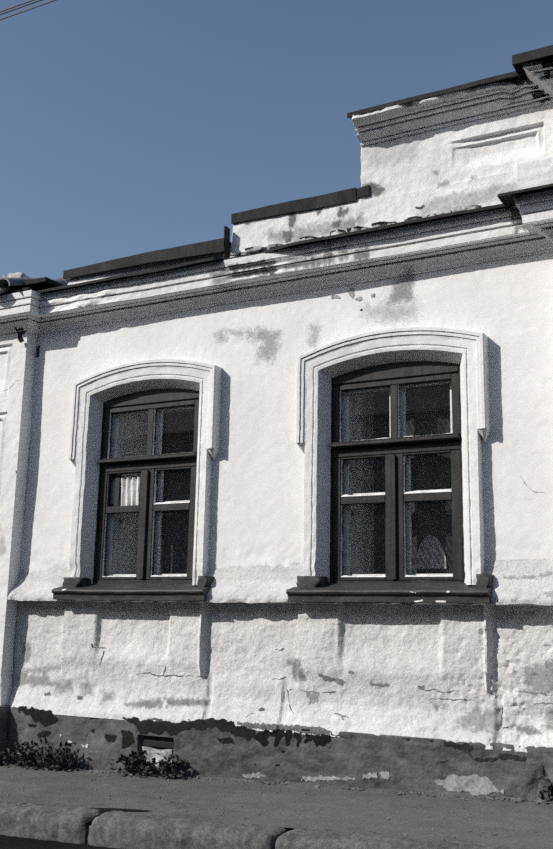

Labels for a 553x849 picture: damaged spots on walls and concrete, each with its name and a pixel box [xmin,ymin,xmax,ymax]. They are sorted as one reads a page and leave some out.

spalling [508,76,552,103]
water stain [363,183,384,196]
water stain [509,195,525,233]
water stain [390,269,413,301]
crack [139,666,206,678]
spalling [318,671,354,685]
peeling [306,691,319,704]
peeling [18,706,88,748]
peeling [104,717,331,753]
spalling [444,741,526,762]
spalling [301,771,390,782]
spalling [434,774,504,795]